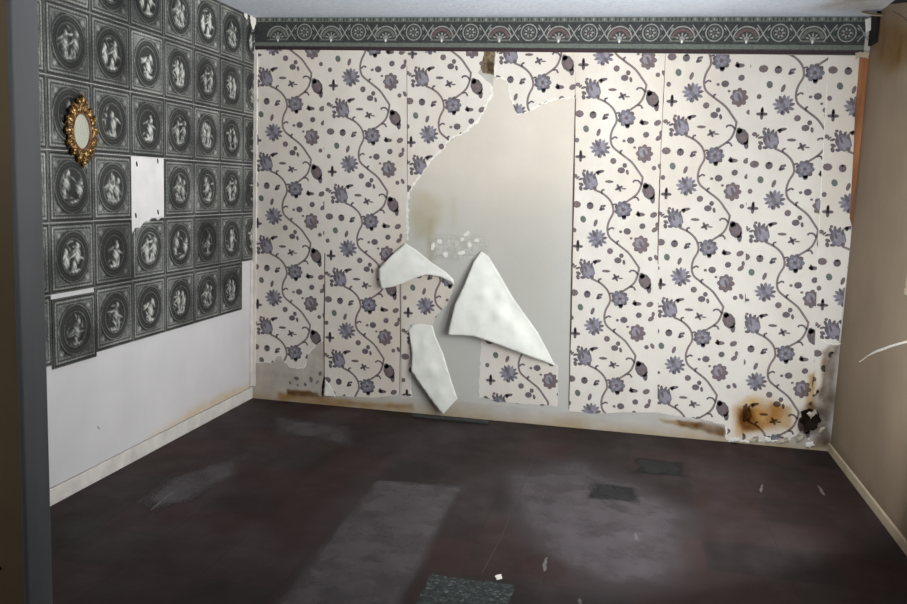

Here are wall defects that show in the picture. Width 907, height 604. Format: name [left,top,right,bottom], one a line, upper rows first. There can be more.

peeling [131,157,164,234]
peeling [431,231,479,257]
damp [740,410,754,429]